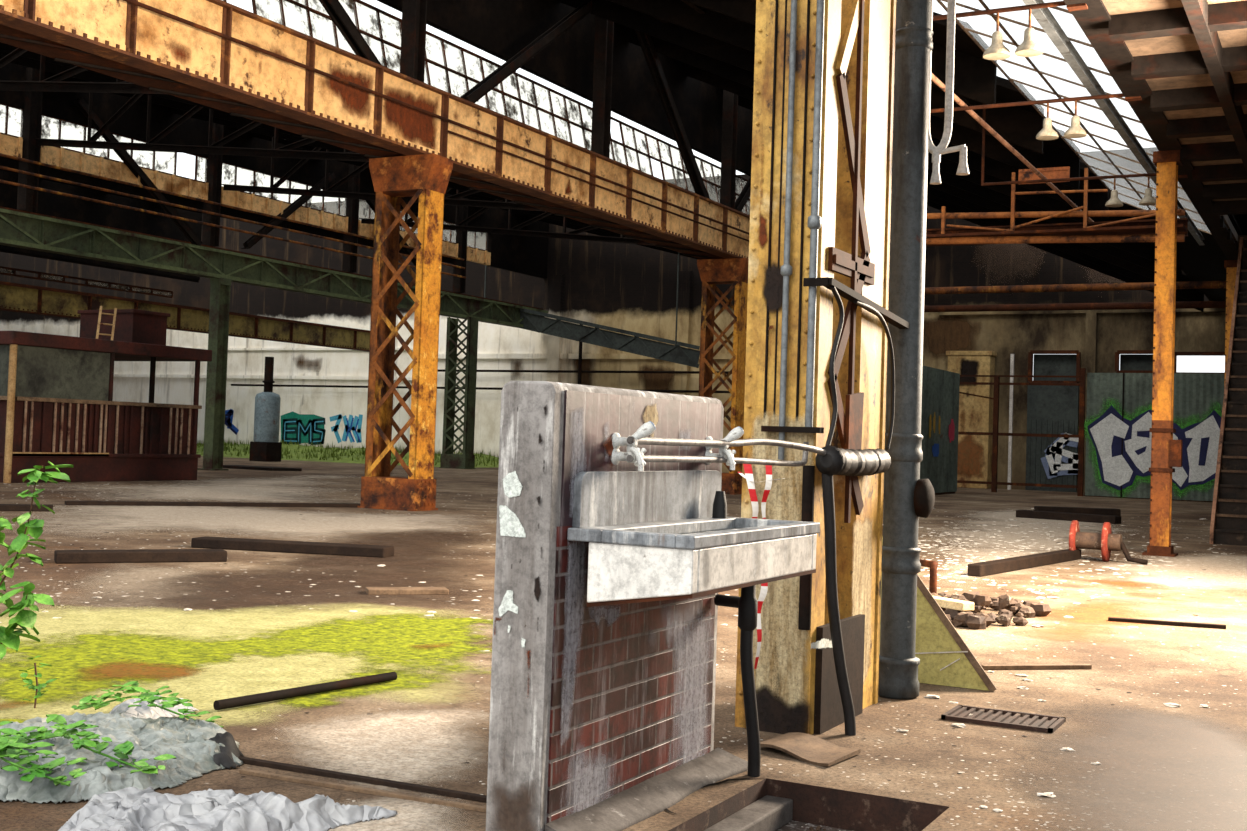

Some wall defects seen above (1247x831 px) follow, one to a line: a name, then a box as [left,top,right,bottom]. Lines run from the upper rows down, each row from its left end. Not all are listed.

corrosion [326,69,371,116]
corrosion [385,89,438,149]
peeling [499,471,539,537]
peeling [498,590,525,648]
efflorescence [562,542,620,740]
efflorescence [668,619,710,764]